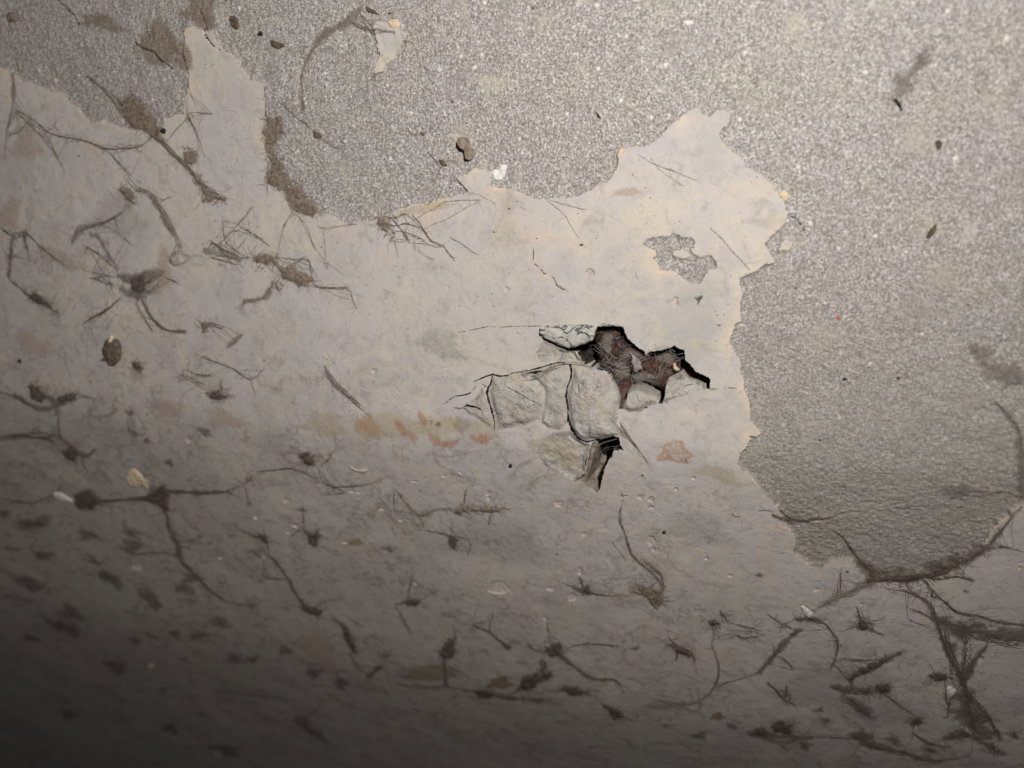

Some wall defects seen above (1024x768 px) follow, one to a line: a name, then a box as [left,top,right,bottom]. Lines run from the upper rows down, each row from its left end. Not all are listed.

peeling [0,0,1024,576]
crack [447,362,599,465]